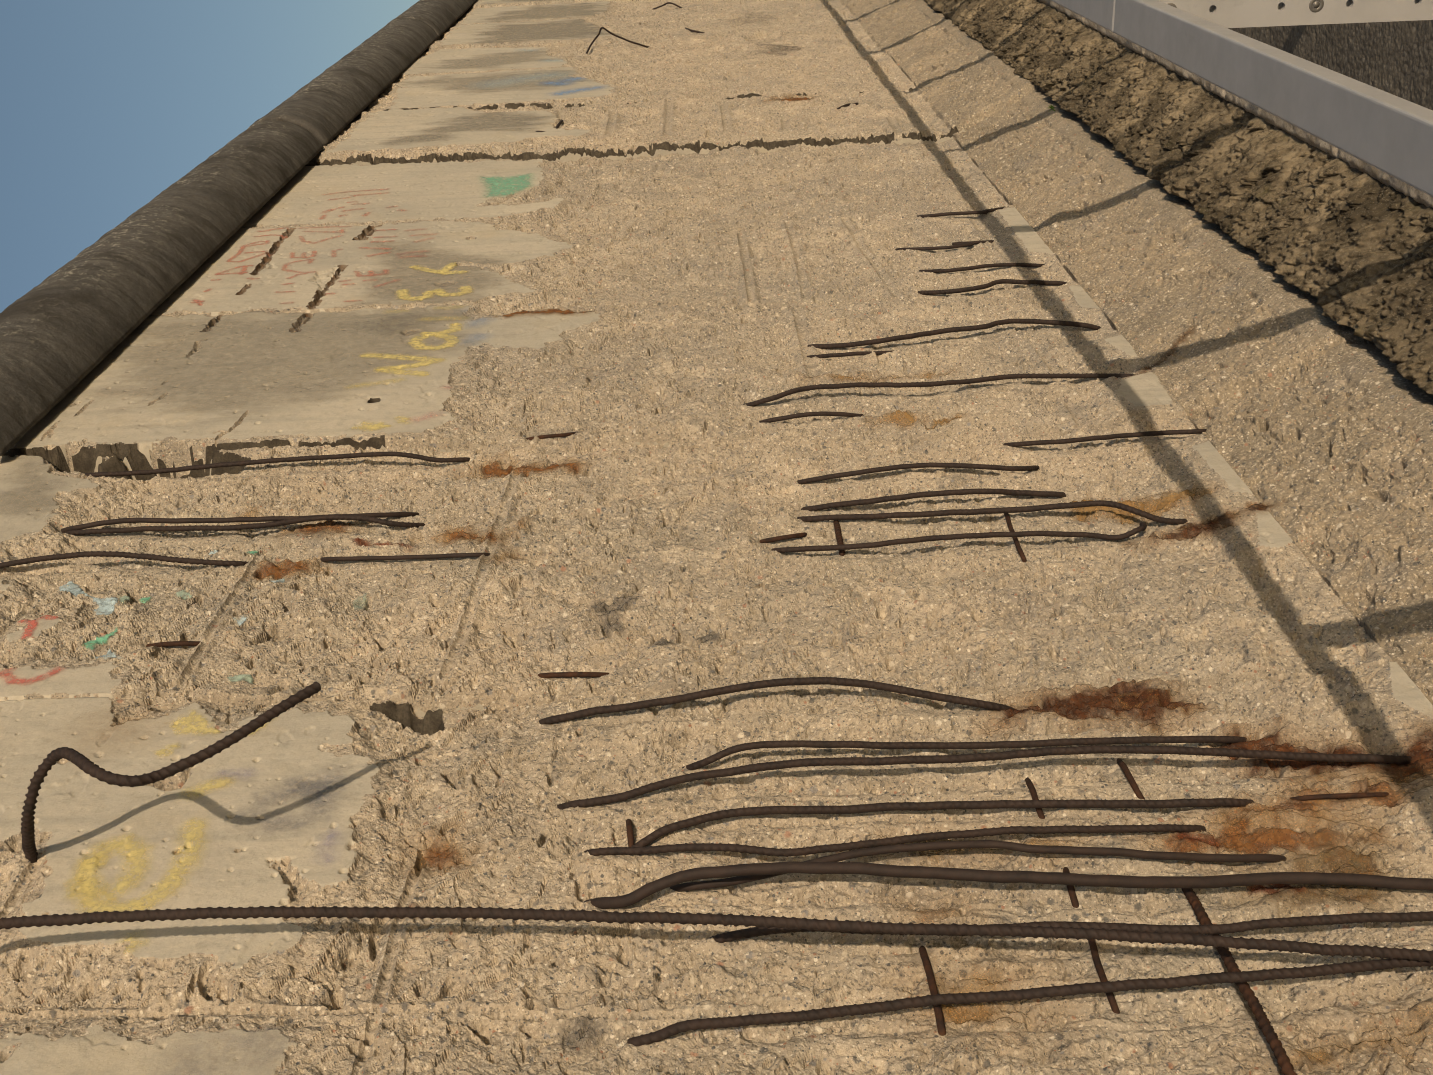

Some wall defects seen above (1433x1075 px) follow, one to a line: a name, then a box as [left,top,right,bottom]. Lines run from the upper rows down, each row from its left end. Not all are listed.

spalling [306,0,949,166]
spalling [0,139,1433,935]
corrosion [1069,489,1197,524]
corrosion [1149,504,1269,541]
corrosion [1003,679,1199,731]
corrosion [1164,725,1433,905]
spalling [0,827,1433,1075]